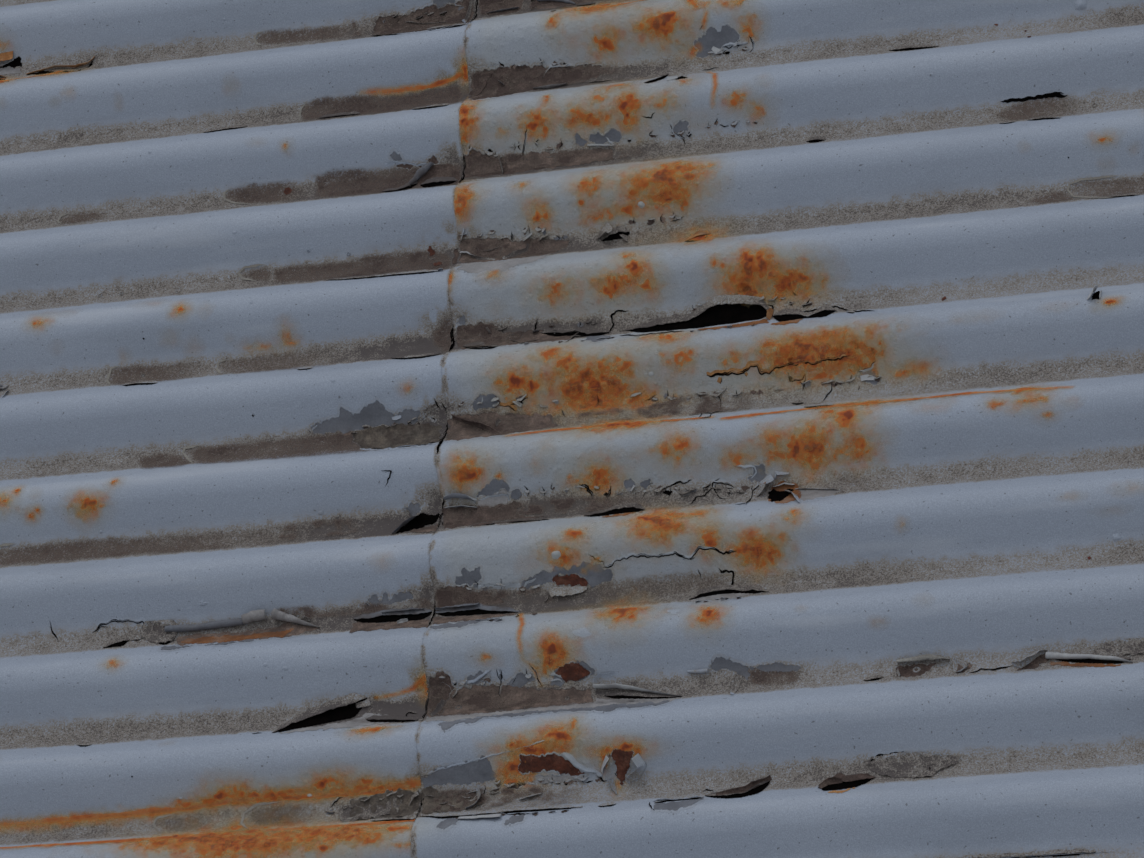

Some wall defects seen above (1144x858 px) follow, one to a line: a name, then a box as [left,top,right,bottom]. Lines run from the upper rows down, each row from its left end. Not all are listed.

rust [578,161,714,221]
peeling [454,293,876,351]
rust [758,328,884,383]
peeling [308,391,561,451]
rust [496,348,1068,474]
crack [696,354,876,418]
peeling [391,461,845,535]
crack [589,543,736,568]
peeling [252,657,682,734]
rust [0,776,421,828]
peeling [324,740,646,832]
rust [0,819,415,858]